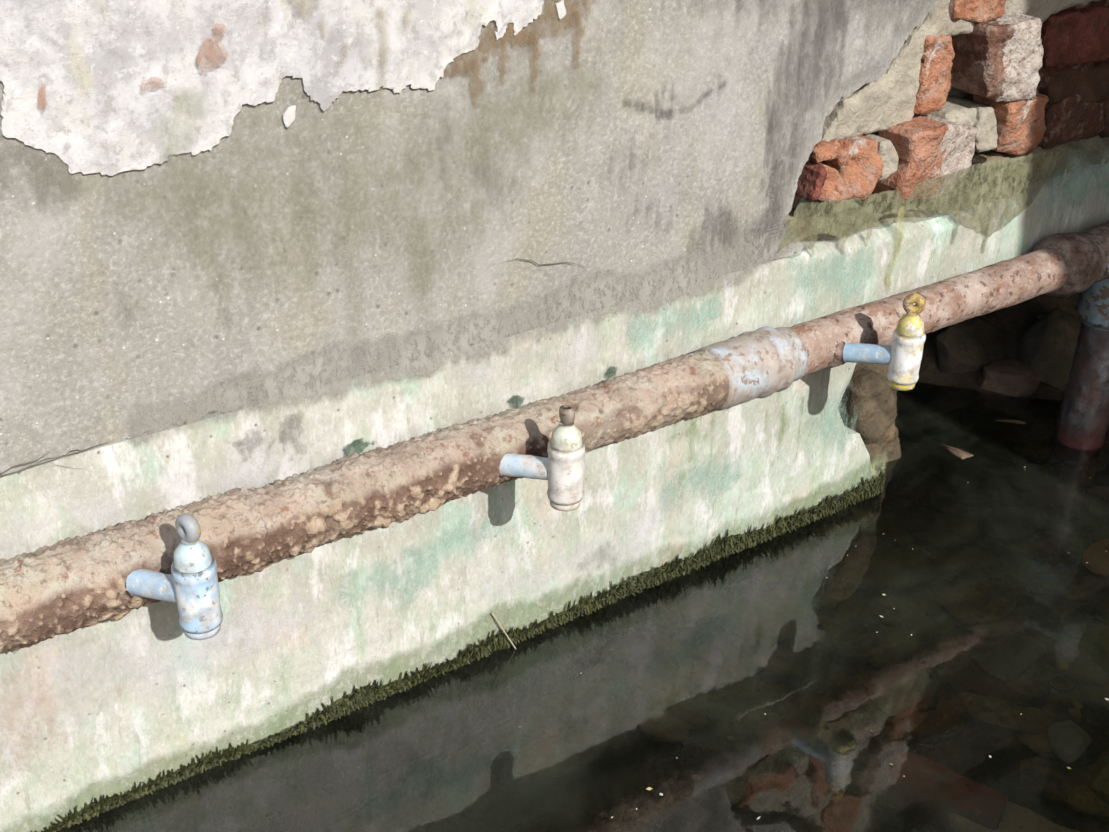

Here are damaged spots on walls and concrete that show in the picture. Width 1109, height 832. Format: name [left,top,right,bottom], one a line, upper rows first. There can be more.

peeling [0,0,566,176]
leakage [755,108,1062,257]
spalling [795,0,1109,204]